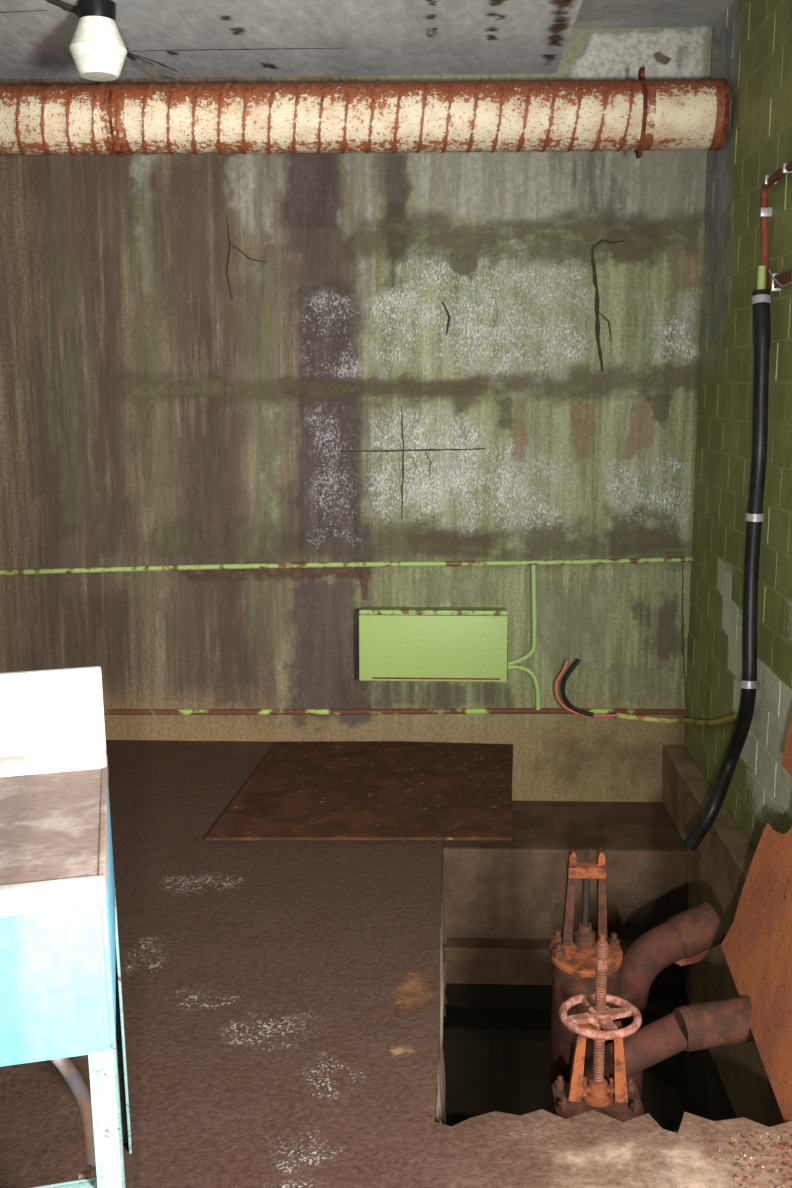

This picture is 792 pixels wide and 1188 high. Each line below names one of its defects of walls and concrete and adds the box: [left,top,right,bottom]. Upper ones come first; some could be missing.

crack [591,239,625,372]
leakage [650,218,725,367]
leakage [32,151,704,700]
leakage [291,579,413,722]